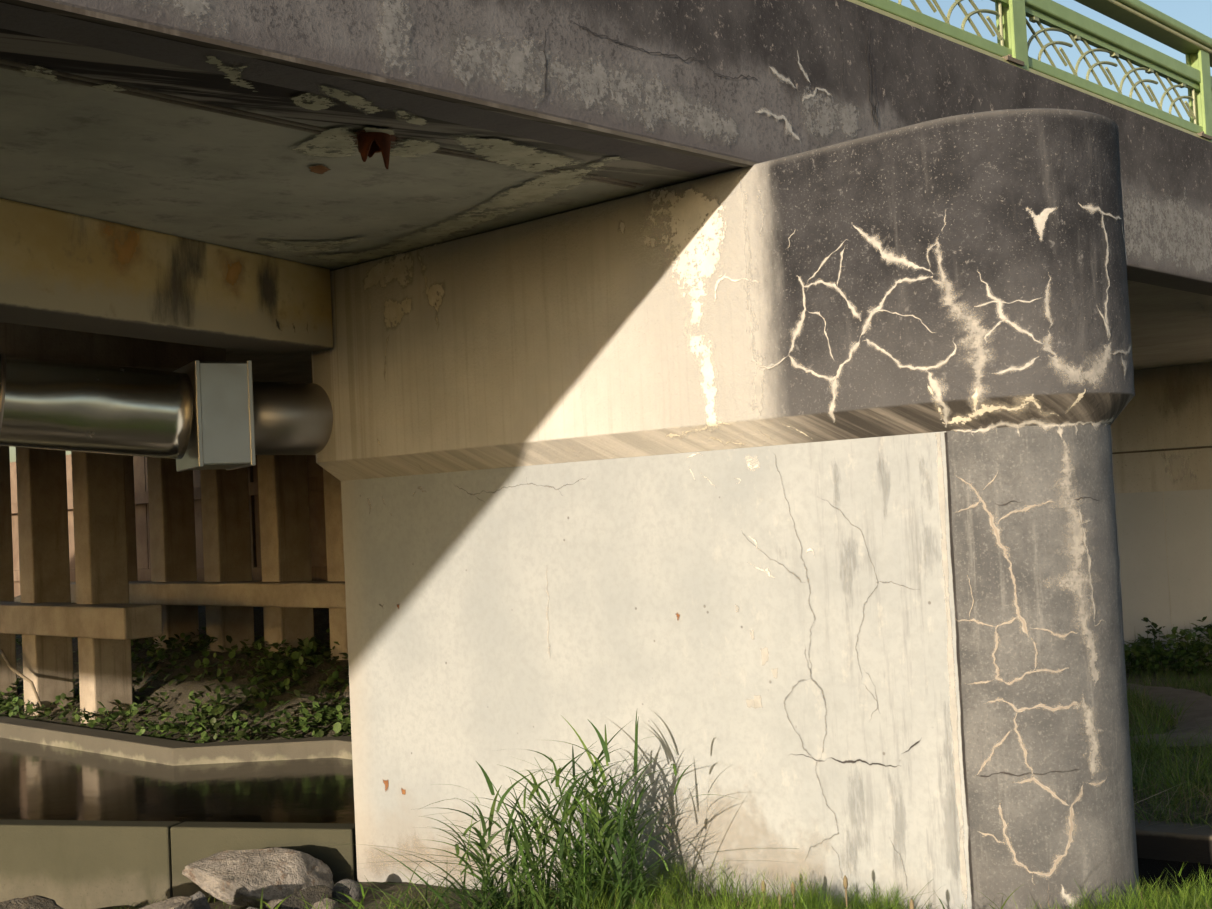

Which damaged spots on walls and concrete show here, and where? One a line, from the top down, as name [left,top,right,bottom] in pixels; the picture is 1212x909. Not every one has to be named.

spalling [205,54,257,92]
spalling [291,86,440,157]
crack [544,20,758,94]
peeling [643,187,759,445]
crack [752,225,957,427]
crack [974,271,1045,374]
crack [1078,203,1128,340]
crack [958,439,1120,885]
crack [793,741,919,767]